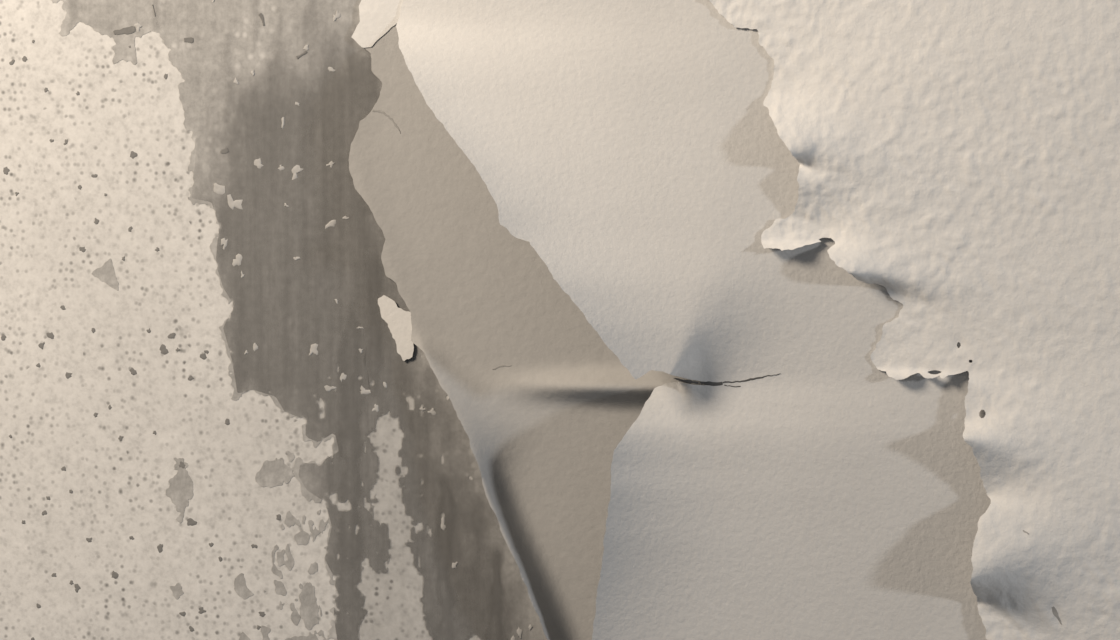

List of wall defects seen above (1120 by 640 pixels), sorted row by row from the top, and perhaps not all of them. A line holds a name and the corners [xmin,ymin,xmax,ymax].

damp [223,72,500,640]
peeling [51,0,690,640]
crack [673,373,781,387]
peeling [396,0,1120,640]